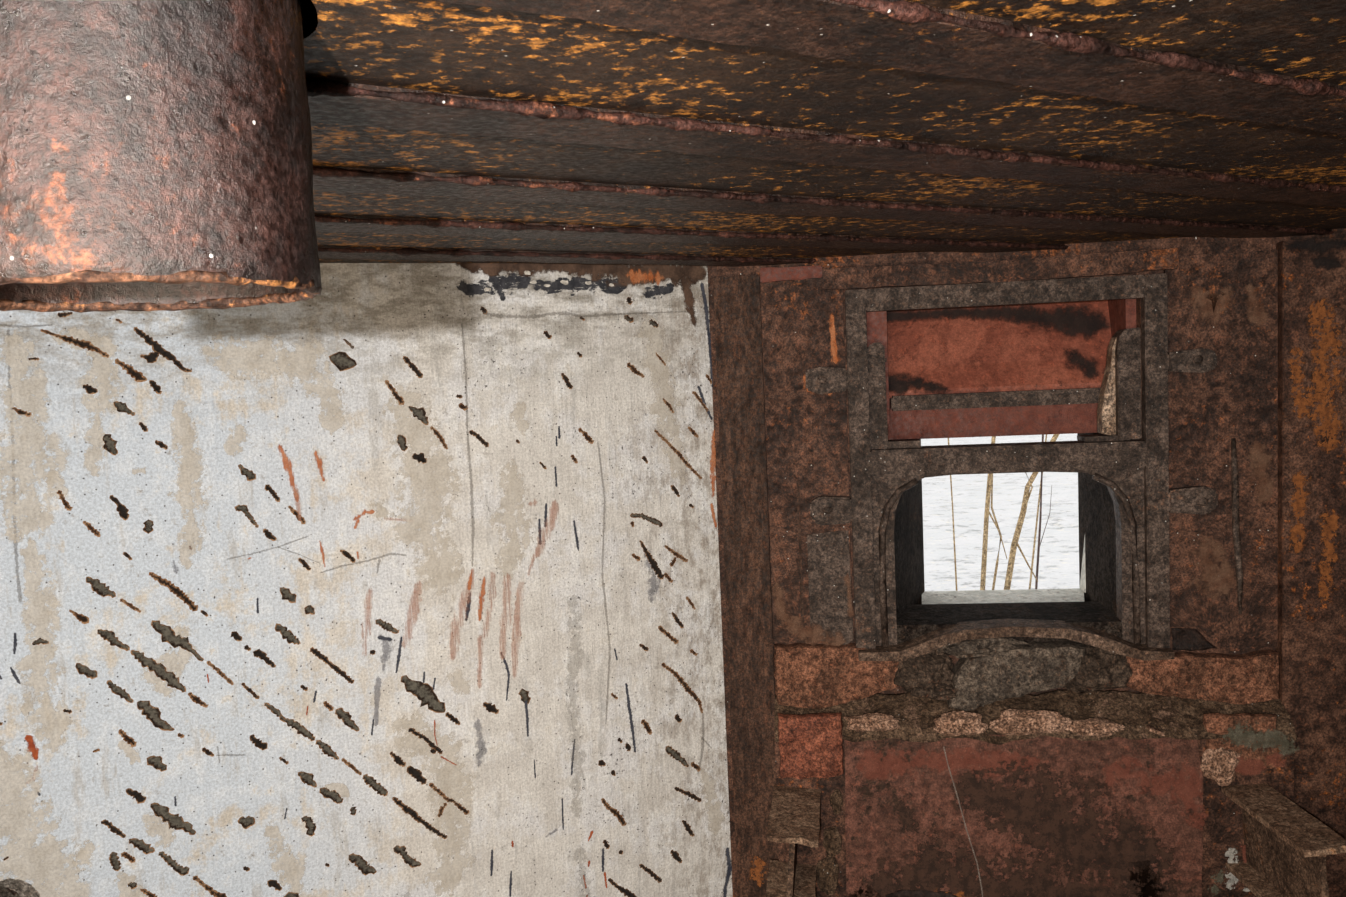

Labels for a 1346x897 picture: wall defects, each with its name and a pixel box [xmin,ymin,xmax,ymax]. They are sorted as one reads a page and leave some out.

corrosion [831,0,1346,97]
corrosion [306,78,1346,194]
corrosion [315,215,1068,250]
corrosion [313,166,1334,235]
corrosion [1287,298,1344,454]
corrosion [279,444,299,502]
corrosion [314,451,325,481]
corrosion [1289,471,1340,607]
peeling [0,312,475,897]
corrosion [468,570,486,621]
spalling [483,702,499,714]
corrosion [847,759,1178,897]